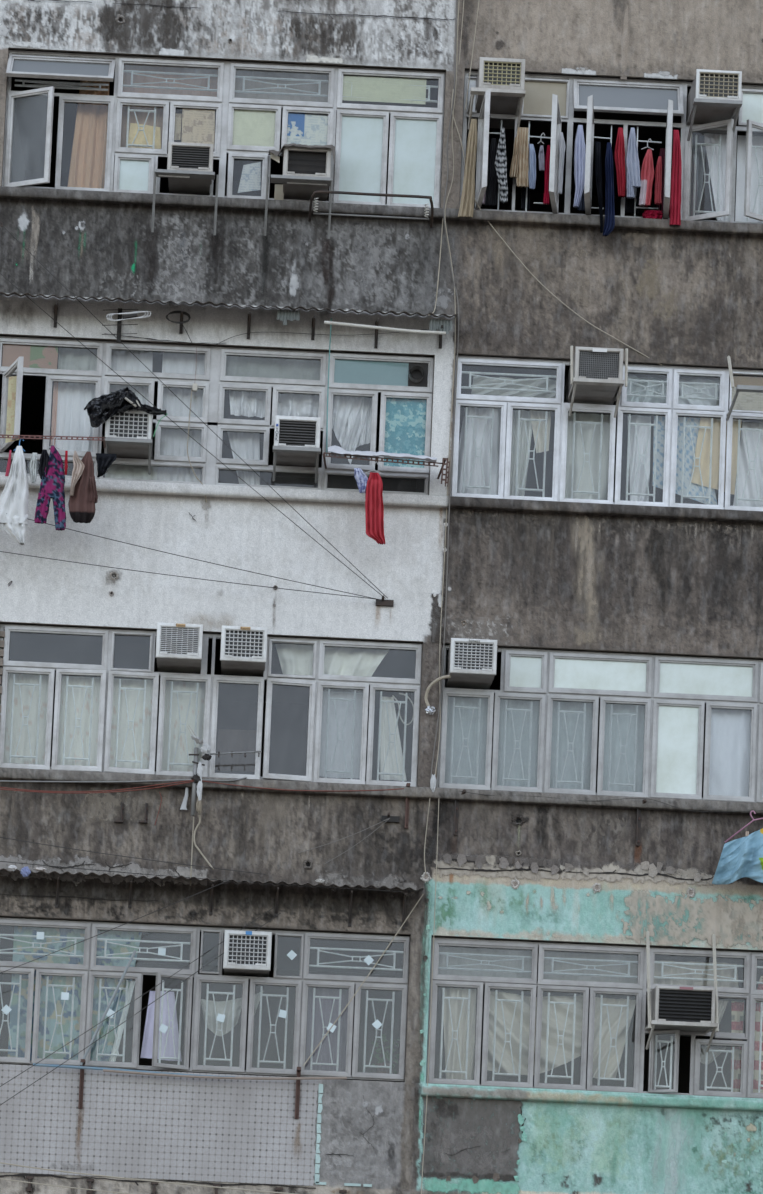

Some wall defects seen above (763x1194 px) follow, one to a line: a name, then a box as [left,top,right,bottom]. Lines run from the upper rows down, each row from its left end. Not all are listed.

water stain [0,10,63,48]
water stain [95,0,209,56]
water stain [280,14,361,63]
water stain [391,19,442,56]
water stain [16,211,40,278]
water stain [100,226,223,304]
water stain [282,259,303,296]
water stain [322,239,334,304]
water stain [573,518,601,645]
spalling [0,854,208,887]
water stain [381,802,447,882]
peeling [303,851,763,1003]